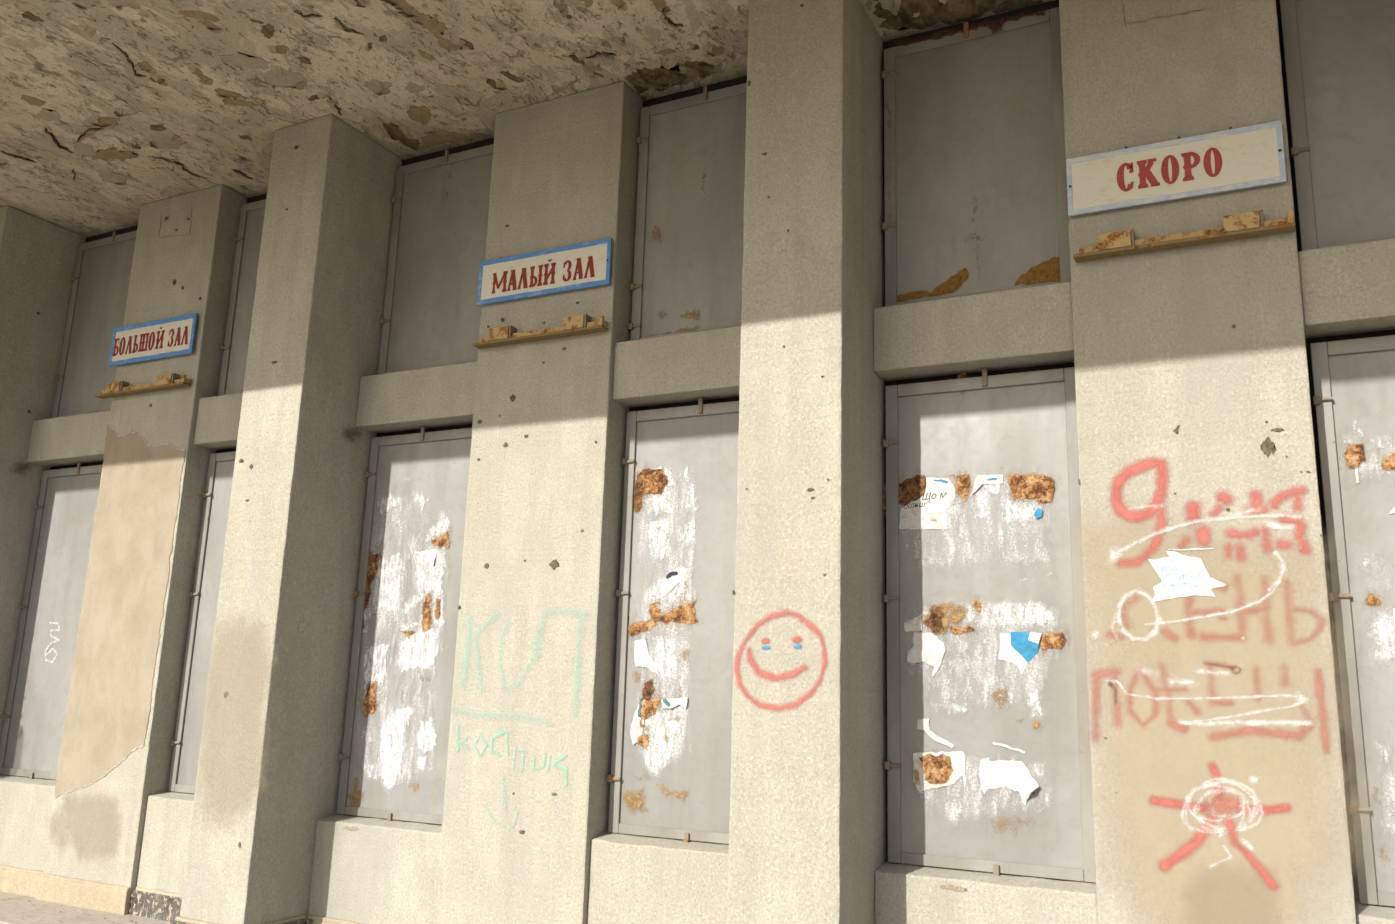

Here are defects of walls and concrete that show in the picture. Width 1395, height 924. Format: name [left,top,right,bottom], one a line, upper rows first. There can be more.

crack [111,42,147,78]
peeling [188,65,257,107]
peeling [218,19,329,101]
crack [298,13,364,35]
crack [326,96,342,116]
peeling [348,0,474,61]
peeling [367,79,493,151]
peeling [624,26,725,95]
crack [2,127,105,181]
peeling [92,125,188,186]
peeling [54,425,185,798]
damp [1101,539,1318,924]